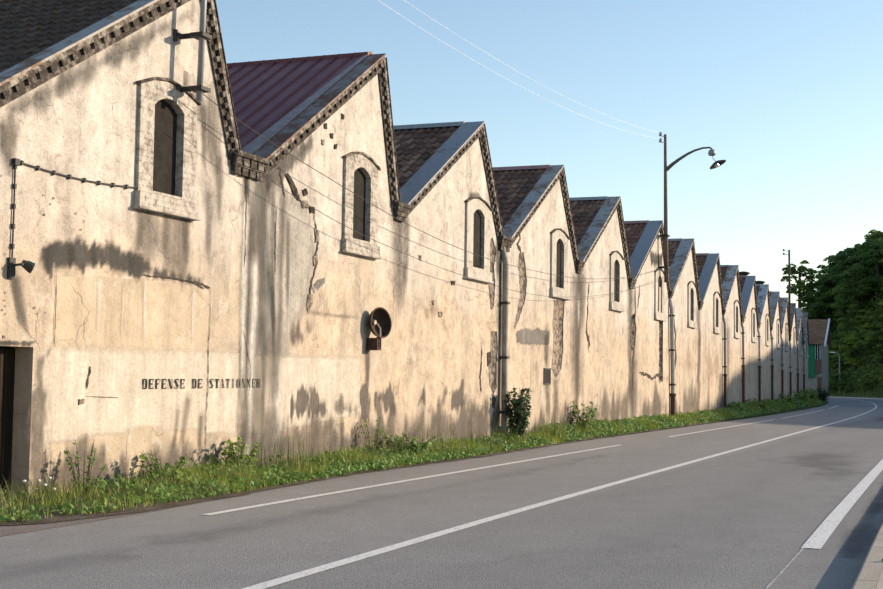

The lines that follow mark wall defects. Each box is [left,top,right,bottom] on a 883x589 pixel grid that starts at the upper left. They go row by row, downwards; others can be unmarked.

damp [140,216,187,279]
damp [240,138,396,467]
spalling [514,236,527,328]
spalling [551,300,565,378]
crack [640,319,677,380]
damp [405,380,498,446]